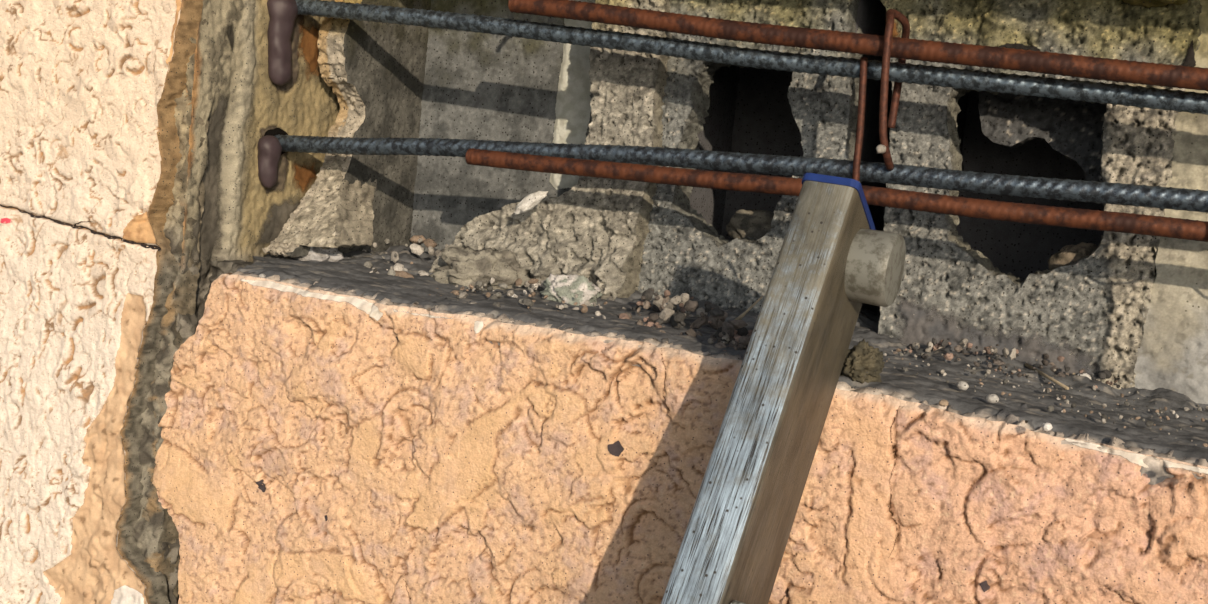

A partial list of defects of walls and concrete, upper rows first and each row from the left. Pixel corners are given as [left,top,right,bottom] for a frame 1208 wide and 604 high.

spalling [226,25,234,51]
spalling [275,0,1208,281]
crack [0,205,161,251]
flaking render [241,279,452,321]
peeling [43,293,146,604]
crack [889,408,899,557]